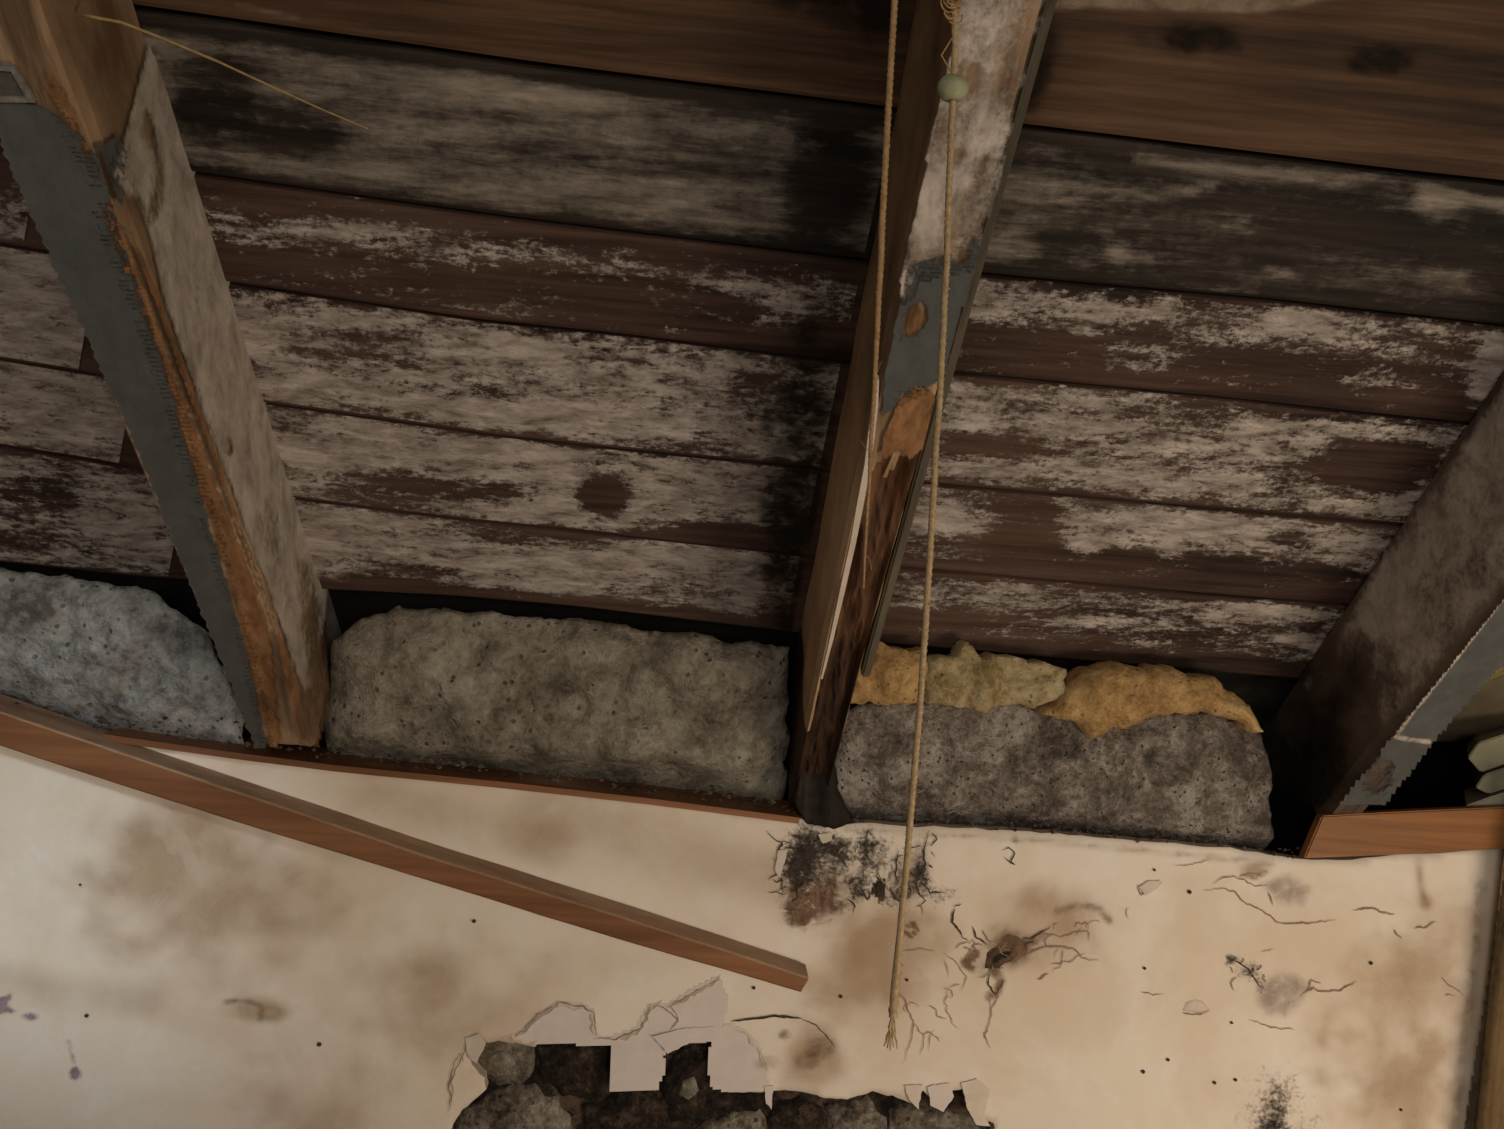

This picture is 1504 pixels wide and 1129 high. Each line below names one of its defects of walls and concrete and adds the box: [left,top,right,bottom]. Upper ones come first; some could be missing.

damp [758,360,830,647]
damp [0,994,35,1019]
spalling [448,975,990,1129]
damp [767,825,955,999]
crack [899,904,1129,1060]